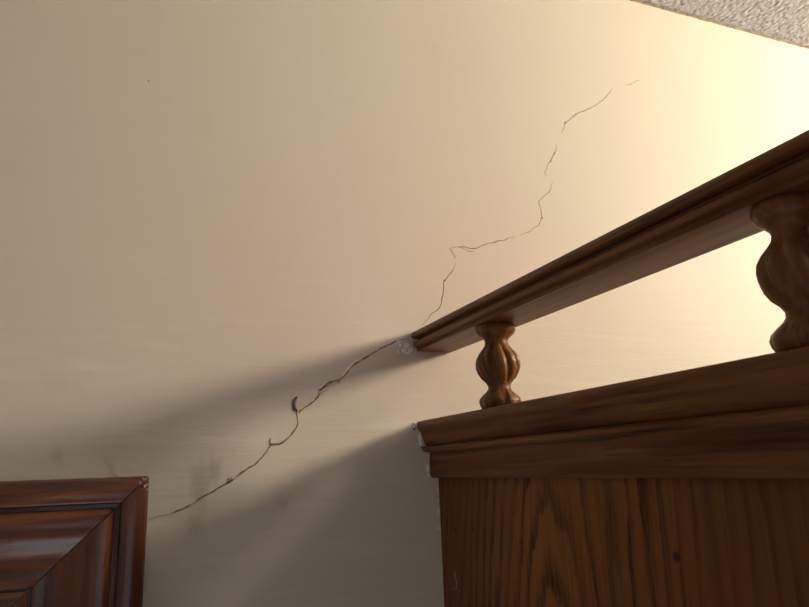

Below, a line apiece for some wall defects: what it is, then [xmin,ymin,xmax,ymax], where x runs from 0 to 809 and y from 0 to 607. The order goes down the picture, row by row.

crack [423,80,639,324]
crack [148,338,407,520]